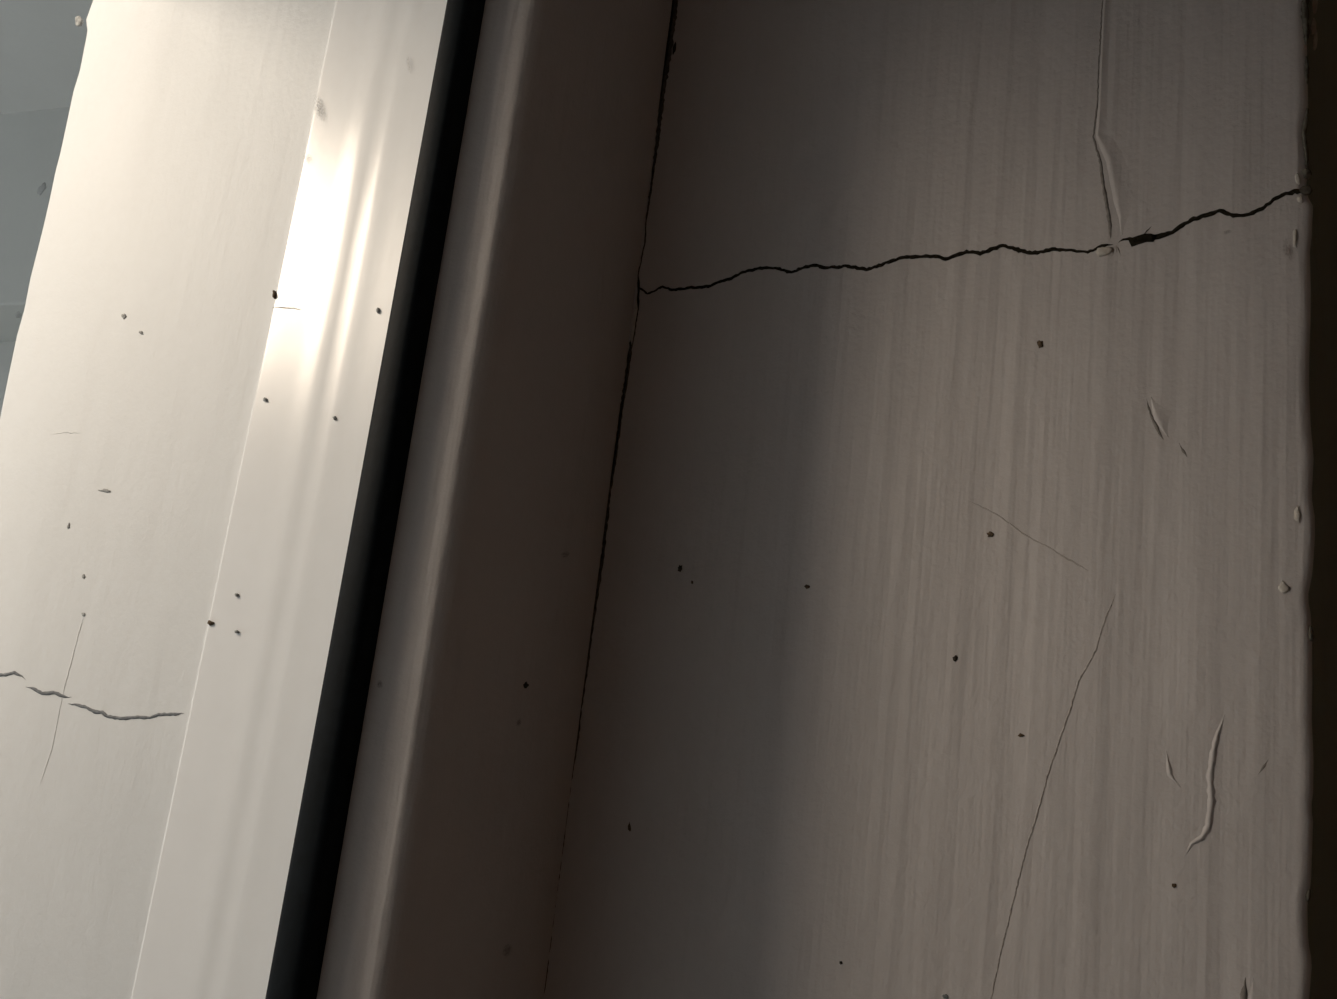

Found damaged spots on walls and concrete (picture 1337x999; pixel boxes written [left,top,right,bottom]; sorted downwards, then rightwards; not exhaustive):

crack [0,616,183,786]
crack [544,0,1312,999]